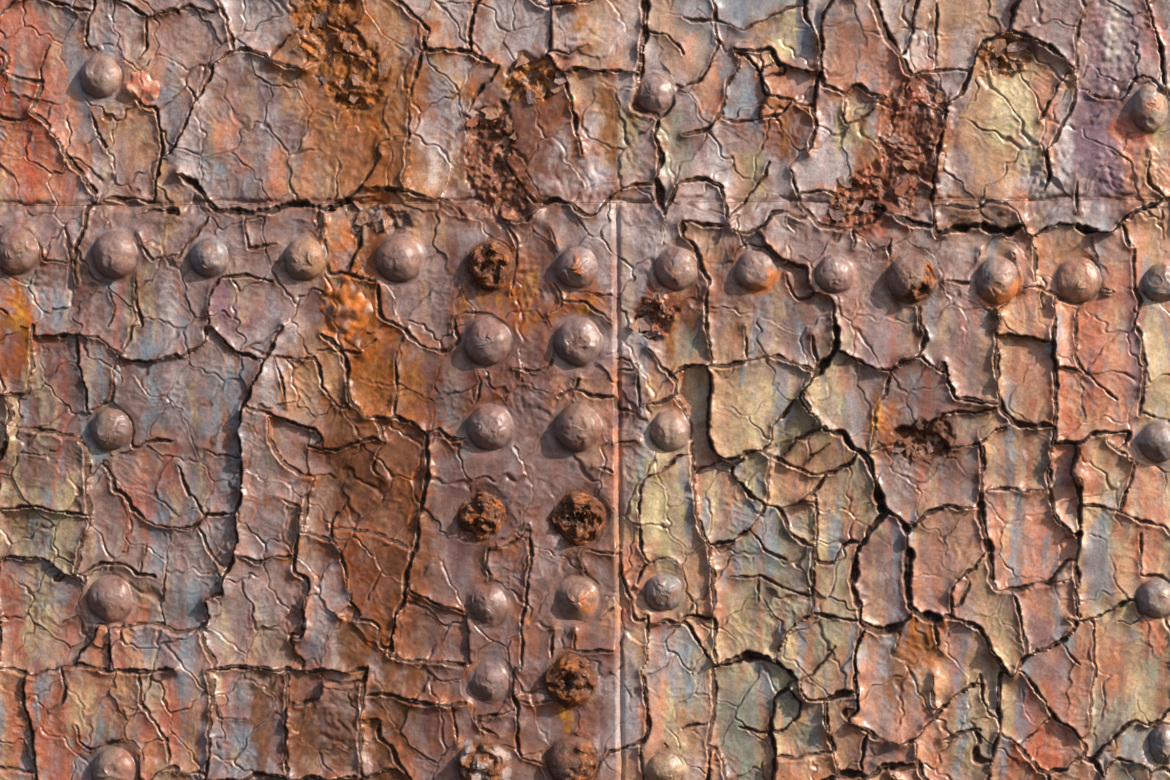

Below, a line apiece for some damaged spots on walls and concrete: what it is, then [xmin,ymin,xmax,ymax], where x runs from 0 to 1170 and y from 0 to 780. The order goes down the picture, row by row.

rust [288,0,413,137]
spalling [508,51,571,104]
rust [429,59,558,228]
spalling [466,106,529,224]
rust [869,99,933,175]
crack [493,0,1170,780]
spalling [891,416,952,462]